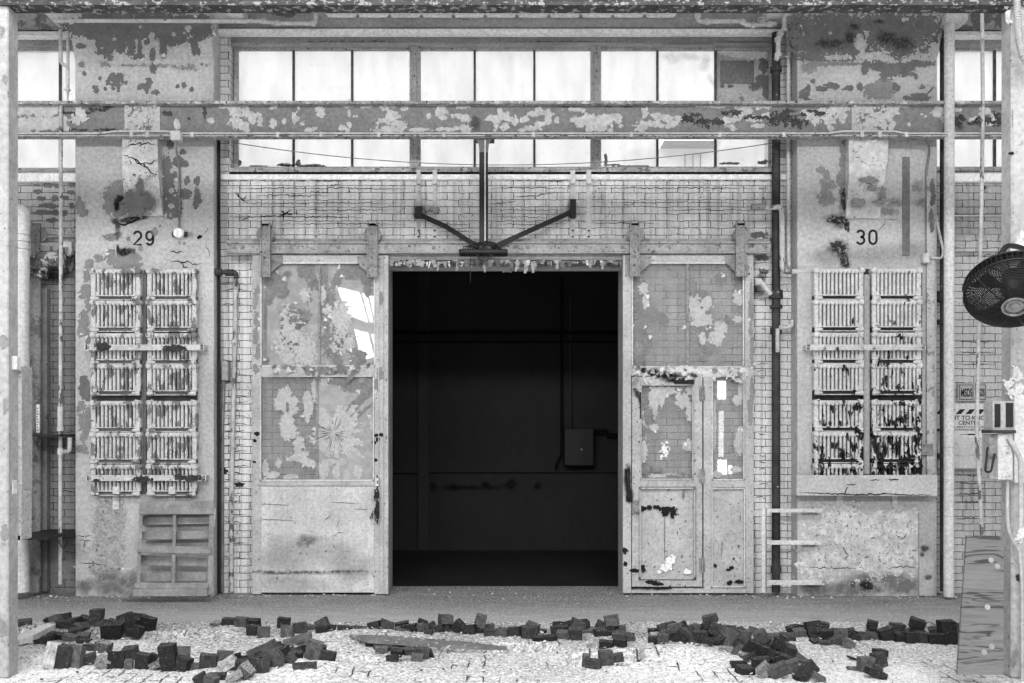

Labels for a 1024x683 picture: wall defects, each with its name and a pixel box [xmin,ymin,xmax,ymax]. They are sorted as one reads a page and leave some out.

peeling [57,13,216,96]
peeling [785,13,997,132]
peeling [18,106,90,132]
peeling [207,105,326,132]
peeling [338,99,473,132]
peeling [485,106,683,132]
crack [124,142,156,174]
peeling [252,264,384,480]
peeling [632,230,772,519]